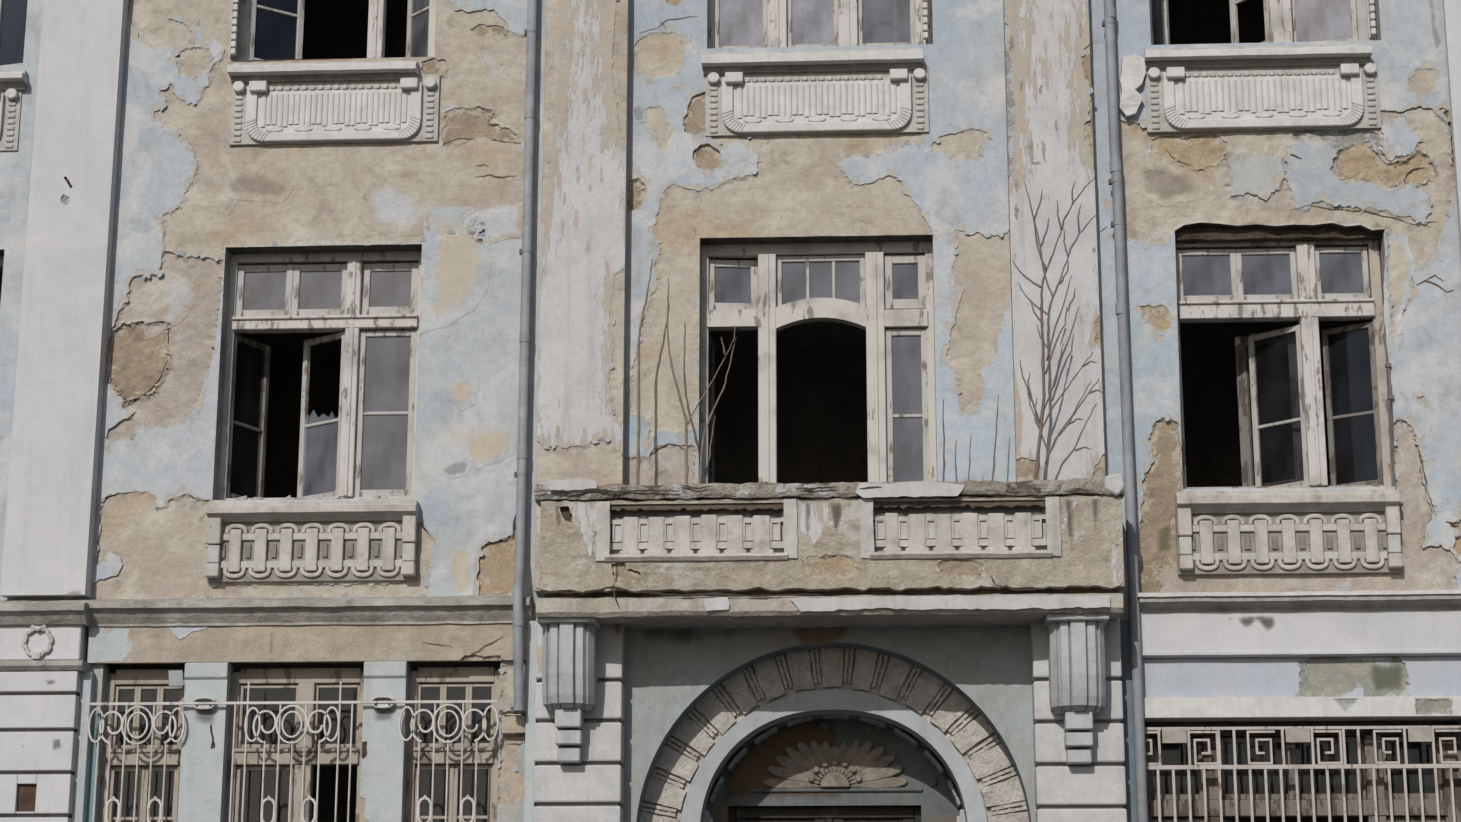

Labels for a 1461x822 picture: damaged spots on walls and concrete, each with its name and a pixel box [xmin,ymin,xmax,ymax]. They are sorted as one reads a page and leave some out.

peeling [1079,22,1094,166]
flaking render [104,0,527,442]
flaking render [536,0,1058,486]
flaking render [1113,69,1456,319]
flaking render [1139,305,1171,336]
flaking render [90,491,434,599]
flaking render [477,531,516,596]
flaking render [560,507,572,522]
flaking render [612,563,642,588]
flaking render [801,554,861,582]
flaking render [934,559,984,580]
peeling [1295,656,1453,715]